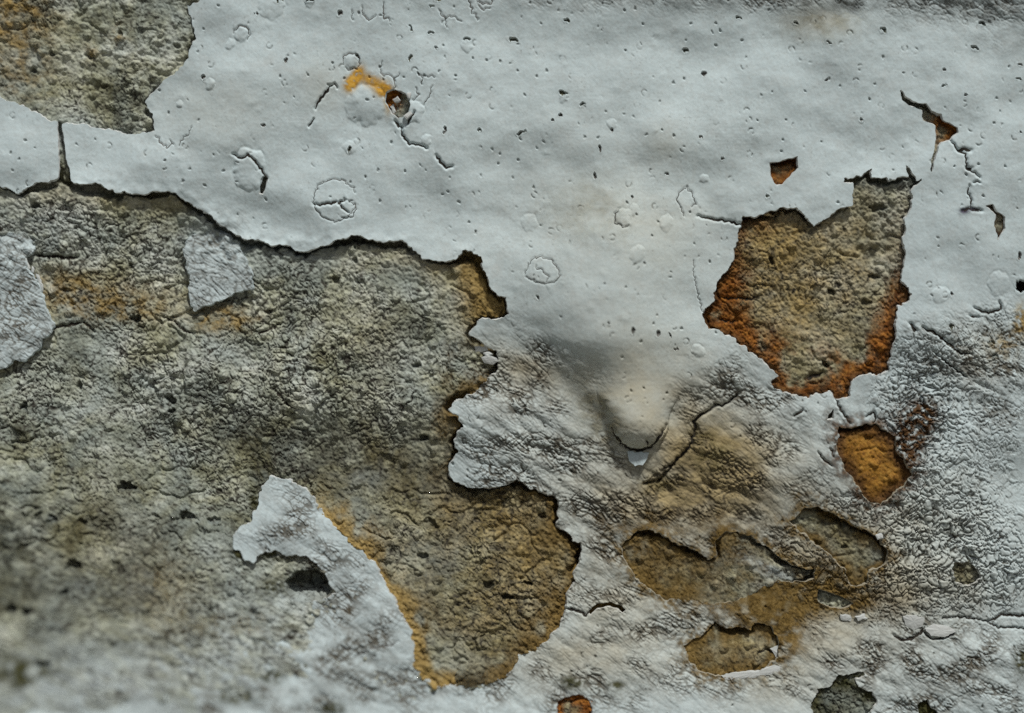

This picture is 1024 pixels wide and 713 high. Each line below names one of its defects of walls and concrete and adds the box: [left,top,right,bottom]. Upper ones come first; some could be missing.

peeling [0,0,200,134]
rust [345,67,401,111]
peeling [769,156,798,185]
rust [702,261,908,399]
peeling [702,165,922,505]
peeling [0,178,582,713]
rust [829,401,936,507]
peeling [621,529,868,621]
peeling [789,507,889,586]
peeling [684,621,782,680]
peeling [811,671,878,713]